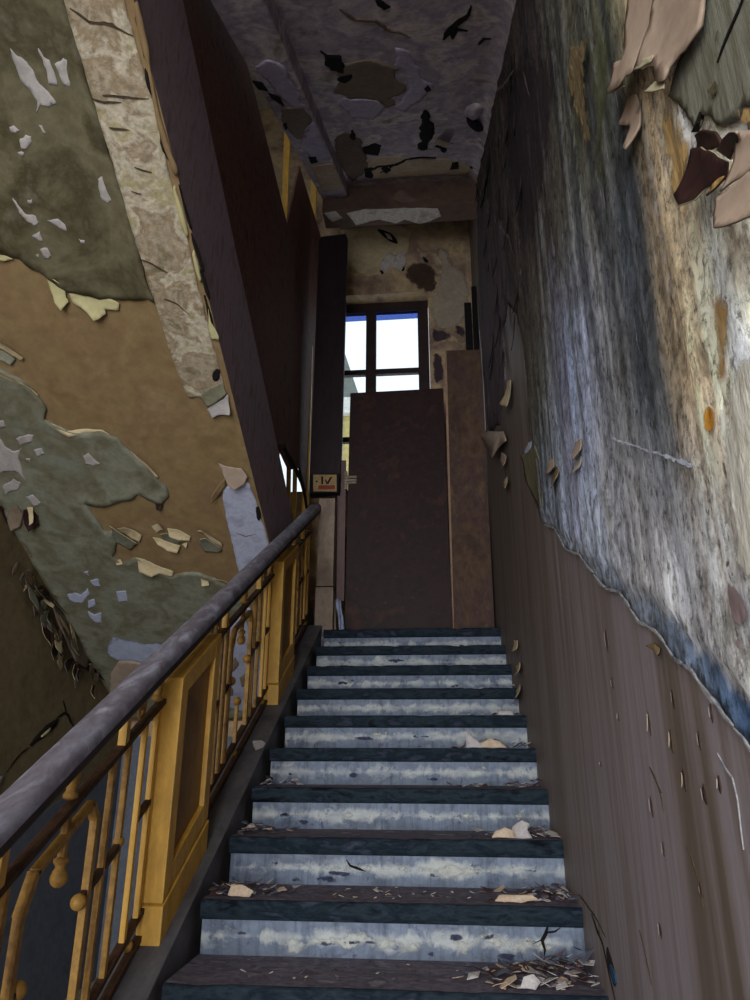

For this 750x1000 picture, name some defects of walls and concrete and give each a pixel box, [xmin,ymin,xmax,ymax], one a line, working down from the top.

peeling [252,80,328,164]
peeling [320,50,407,108]
damp [504,46,557,237]
peeling [0,0,230,418]
damp [406,249,469,342]
damp [433,354,444,383]
peeling [349,0,750,752]
damp [612,437,700,469]
peeling [0,342,269,698]